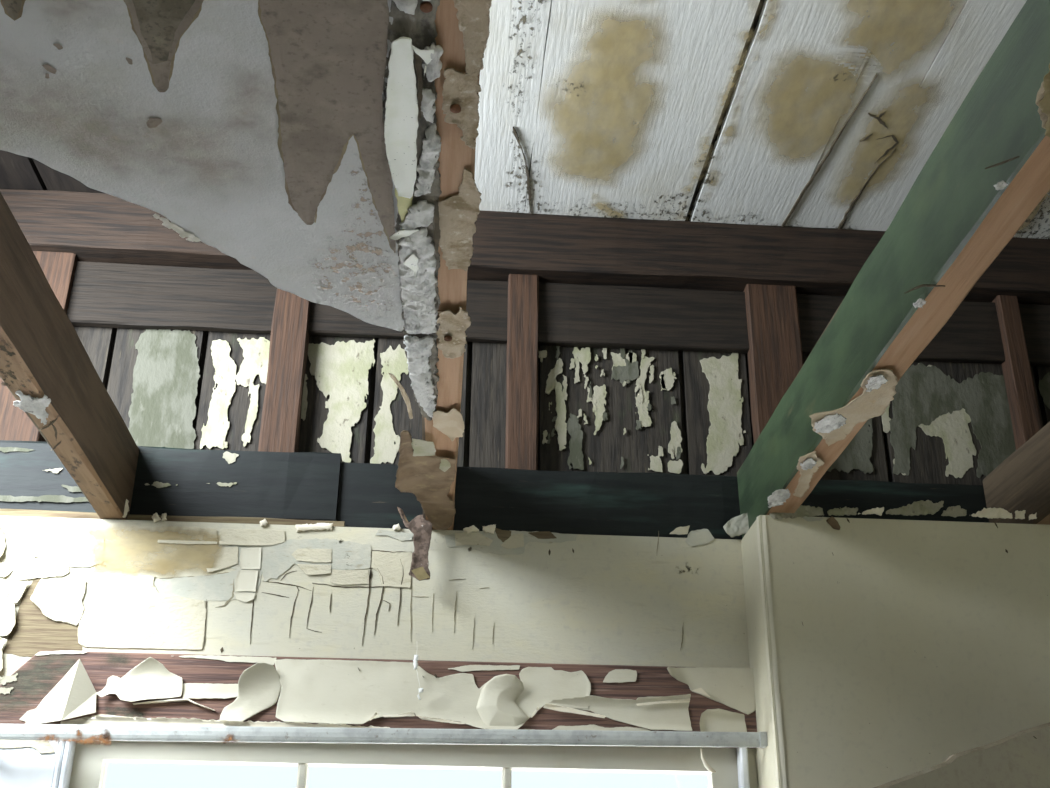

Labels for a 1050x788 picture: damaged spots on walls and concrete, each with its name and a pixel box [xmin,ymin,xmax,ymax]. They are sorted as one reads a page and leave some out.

peeling [384,36,434,240]
mould [508,0,546,114]
water stain [553,18,657,180]
water stain [764,0,953,159]
water stain [837,83,930,202]
peeling [128,329,270,464]
peeling [301,339,409,464]
peeling [539,346,677,470]
peeling [700,353,746,475]
water stain [89,528,220,575]
crack [250,550,494,648]
peeling [0,524,756,732]